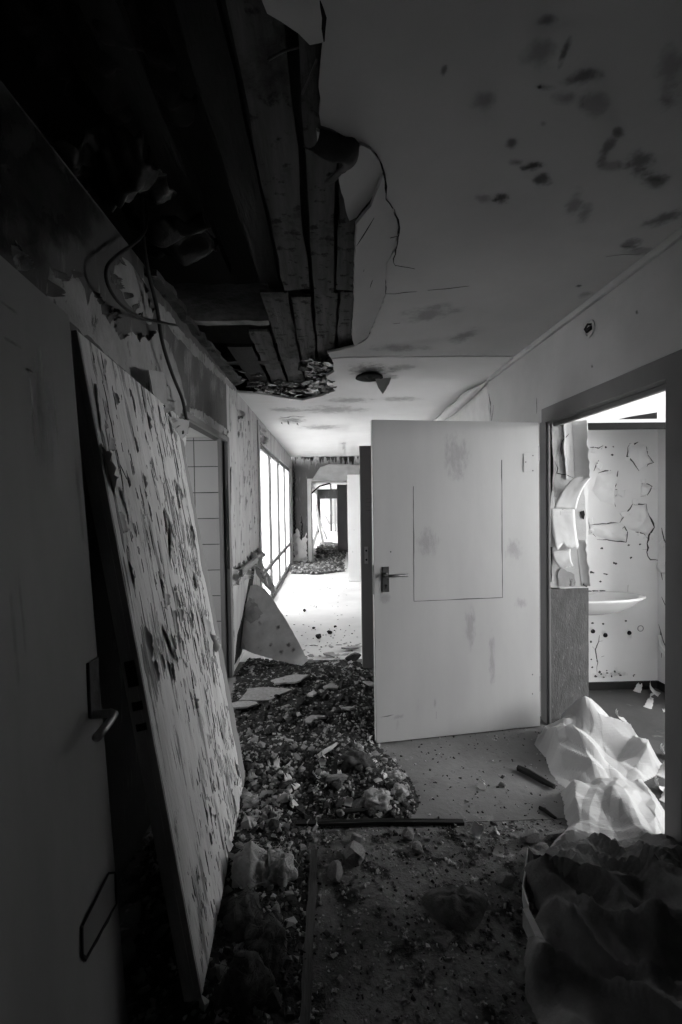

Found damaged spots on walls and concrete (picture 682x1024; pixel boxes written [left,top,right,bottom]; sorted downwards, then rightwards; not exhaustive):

peeling [46,257,270,946]